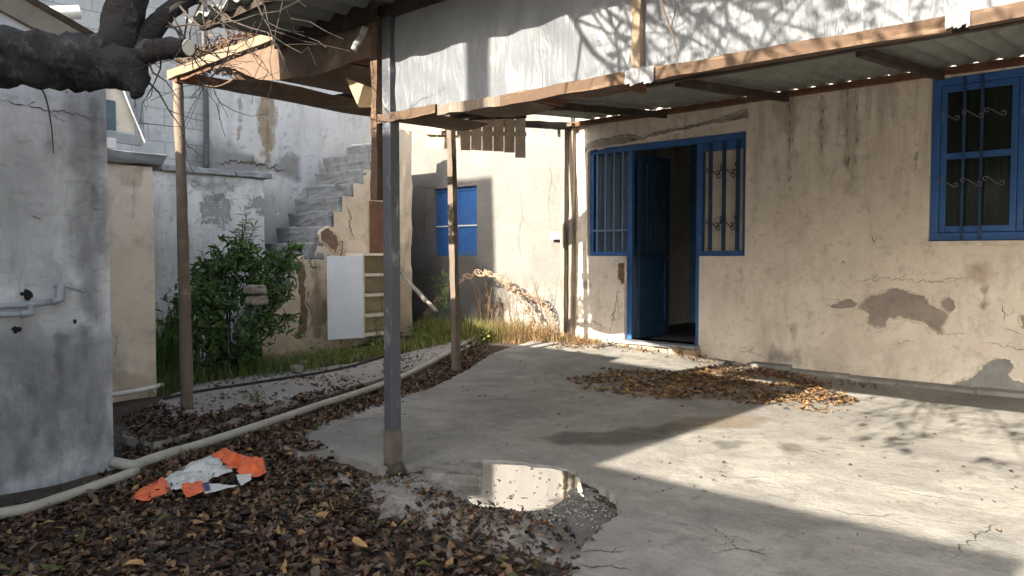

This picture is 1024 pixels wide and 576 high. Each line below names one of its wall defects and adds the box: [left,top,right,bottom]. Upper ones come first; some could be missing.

crack [583,107,749,155]
crack [219,156,286,172]
peeling [192,179,283,230]
flaking render [317,226,341,254]
flaking render [830,286,959,336]
flaking render [952,356,1024,391]